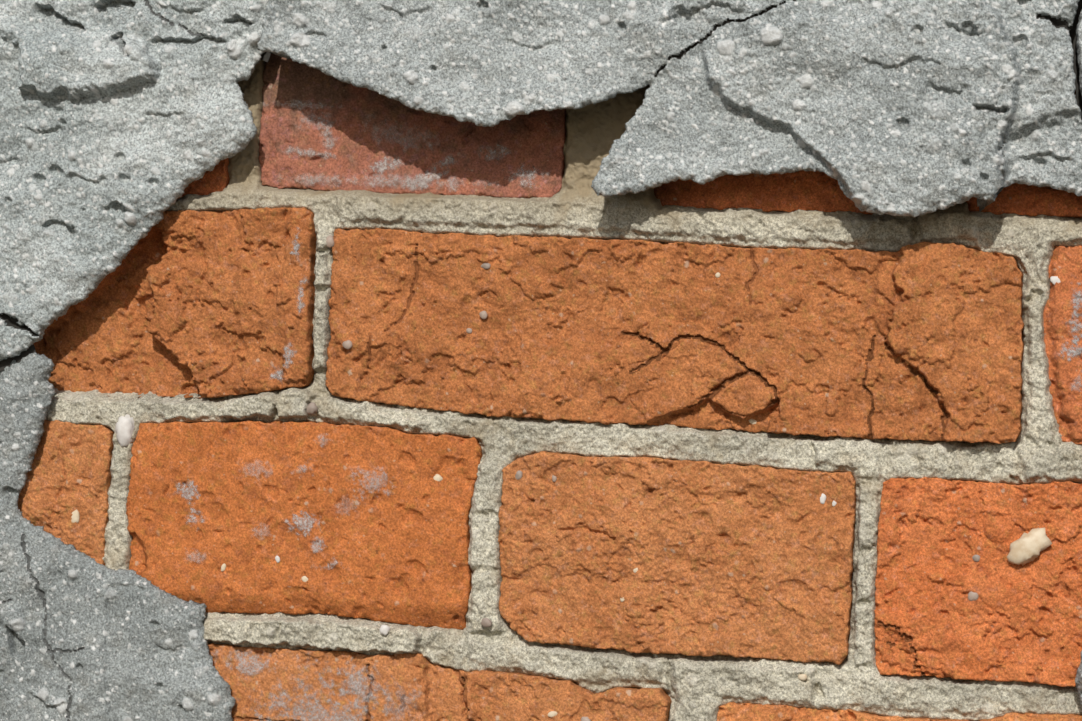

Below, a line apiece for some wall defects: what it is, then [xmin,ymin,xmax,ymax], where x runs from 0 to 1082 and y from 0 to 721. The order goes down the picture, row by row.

crack [654,0,796,77]
crack [1036,0,1082,120]
peeling [702,0,1082,217]
spalling [42,219,76,236]
crack [0,313,39,371]
spalling [33,228,202,398]
spalling [621,331,780,433]
spalling [129,533,147,575]
spalling [6,628,25,656]
spalling [423,662,470,721]